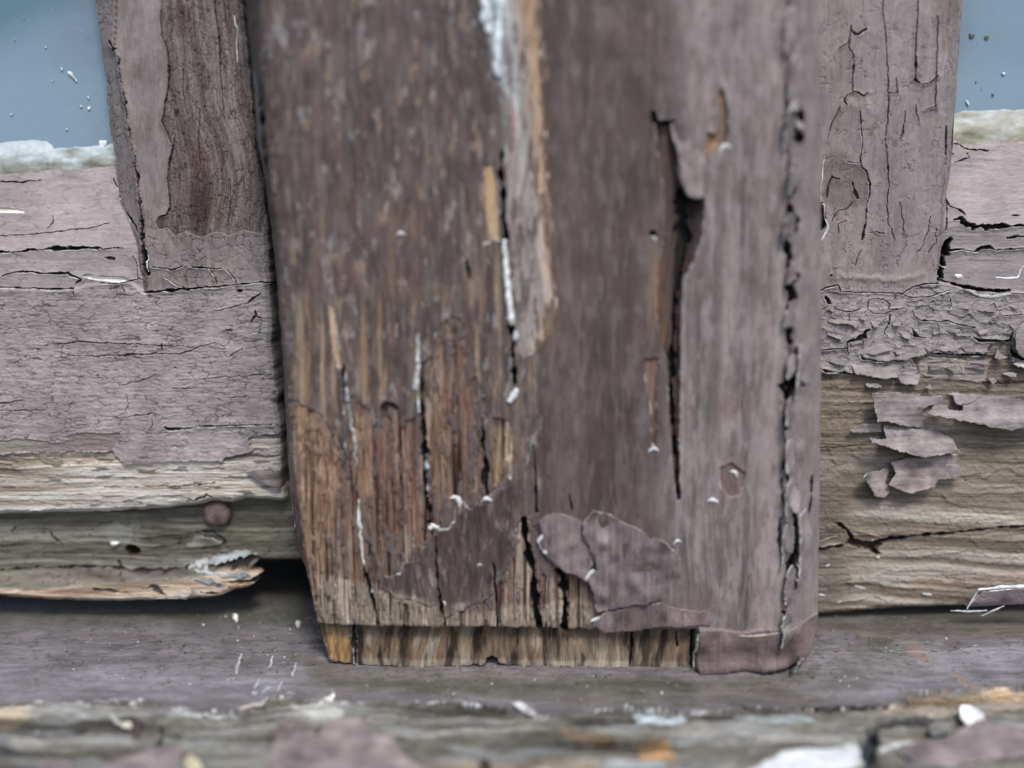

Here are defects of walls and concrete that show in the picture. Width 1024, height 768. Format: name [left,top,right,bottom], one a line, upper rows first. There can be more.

peeling [82,274,130,283]
crack [0,0,277,430]
peeling [156,0,268,237]
peeling [0,316,712,670]
crack [420,367,447,625]
crack [481,417,491,496]
crack [498,149,511,240]
crack [666,187,693,495]
peeling [782,5,807,152]
peeling [737,321,1024,650]
crack [777,0,1024,616]
peeling [962,289,1020,313]